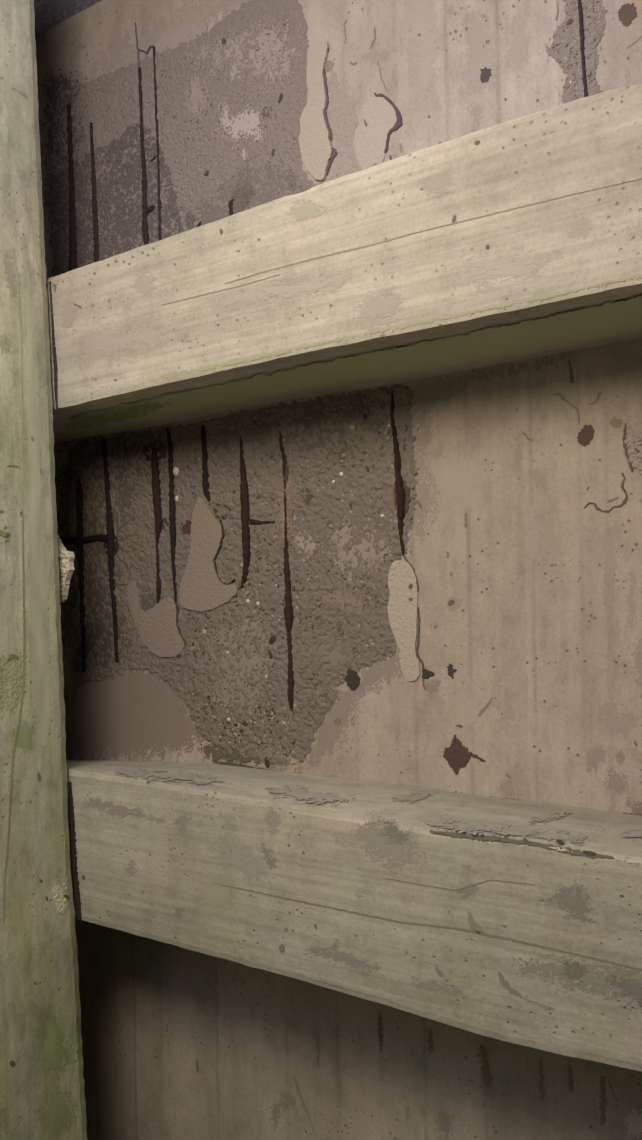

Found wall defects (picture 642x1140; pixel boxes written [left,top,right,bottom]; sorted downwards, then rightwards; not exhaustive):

spalling [43,0,397,285]
crack [323,19,403,175]
spalling [546,0,609,114]
spalling [60,384,420,771]
crack [430,831,613,858]